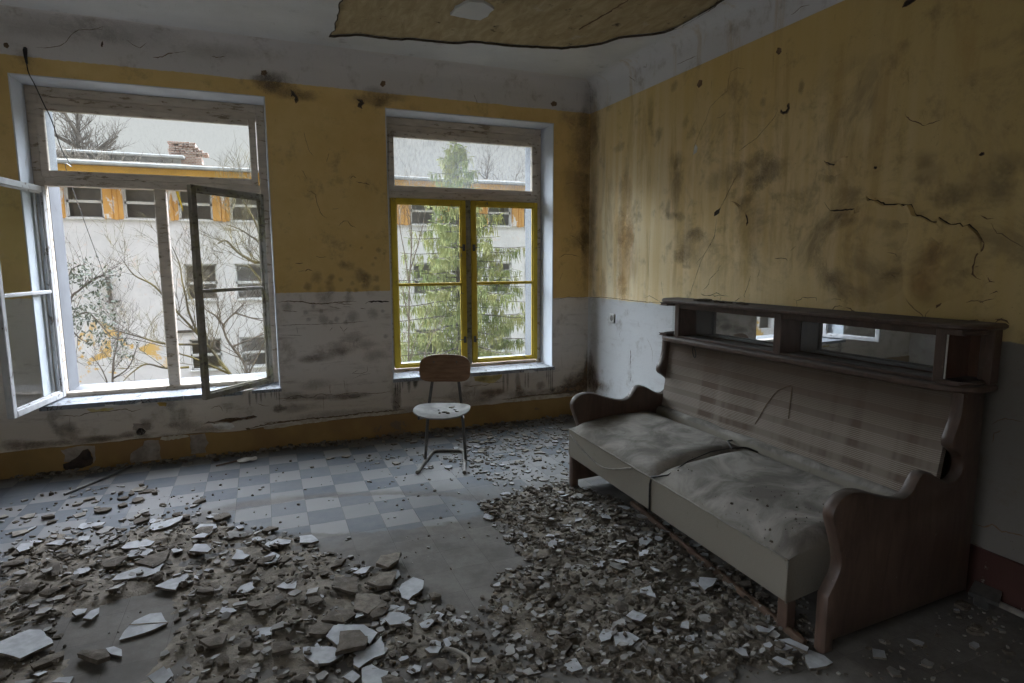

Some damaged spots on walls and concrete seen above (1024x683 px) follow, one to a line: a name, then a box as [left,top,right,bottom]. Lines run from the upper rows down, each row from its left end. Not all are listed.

spalling [329,0,724,50]
water stain [556,357,602,394]
spalling [63,449,93,470]